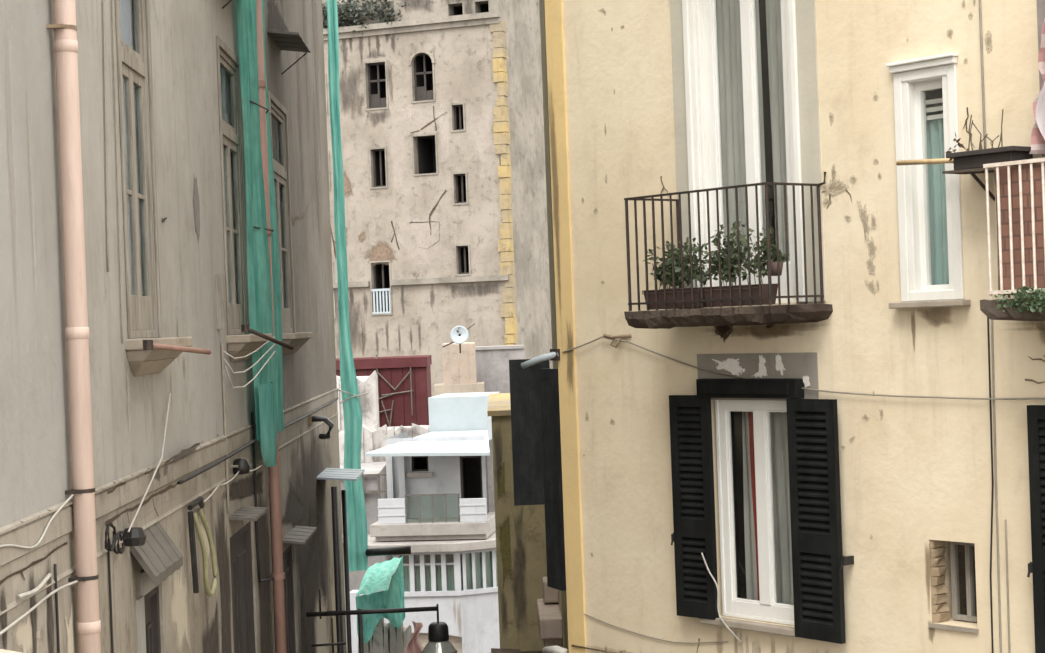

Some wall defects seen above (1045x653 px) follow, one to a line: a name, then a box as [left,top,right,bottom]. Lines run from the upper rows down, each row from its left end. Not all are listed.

water stain [342,34,394,61]
water stain [339,76,357,107]
flaking render [344,173,352,195]
peeling [823,164,857,207]
flaking render [335,228,395,265]
flaking render [845,201,879,294]
water stain [453,285,497,295]
water stain [349,292,420,351]
crack [1025,355,1045,384]